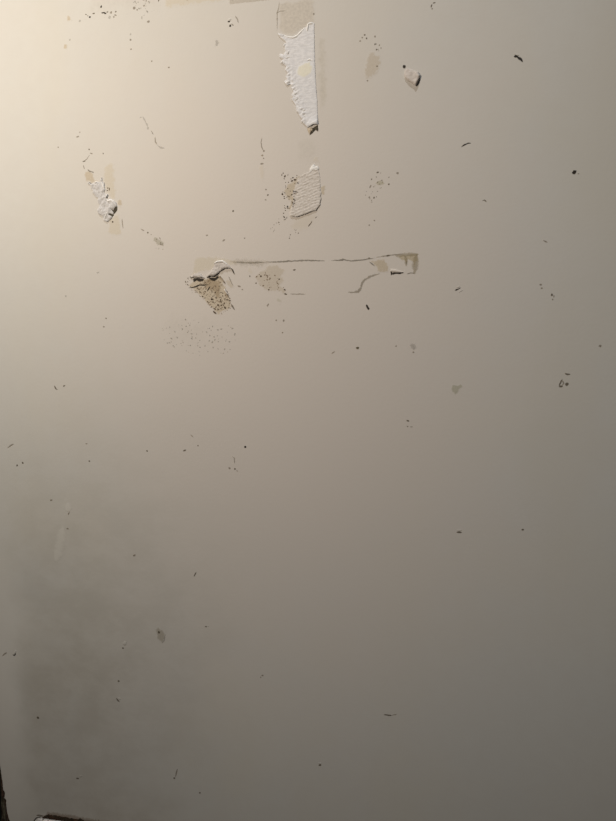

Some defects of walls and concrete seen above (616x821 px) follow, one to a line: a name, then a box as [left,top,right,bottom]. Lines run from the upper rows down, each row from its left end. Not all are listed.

peeling [278,22,318,135]
peeling [83,153,123,237]
peeling [272,154,326,239]
peeling [185,255,239,316]